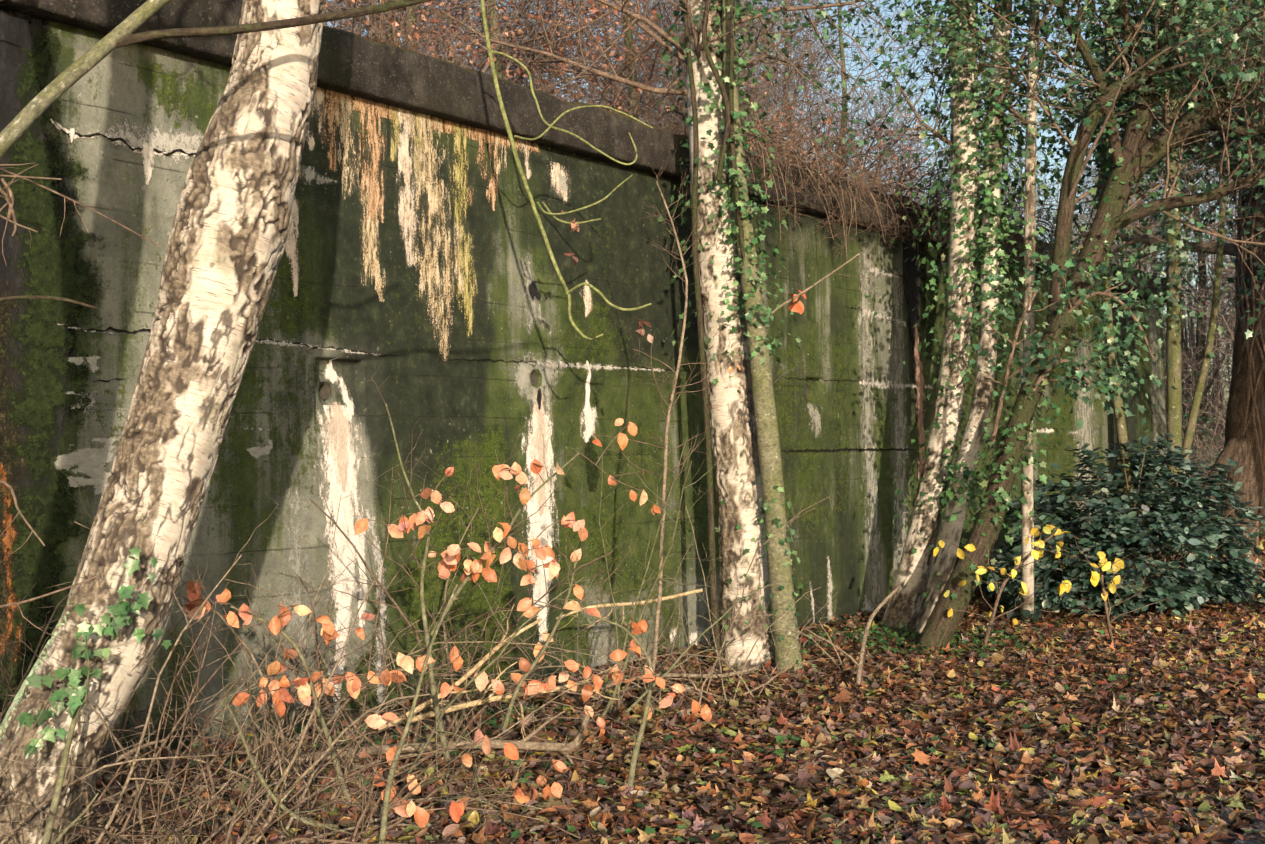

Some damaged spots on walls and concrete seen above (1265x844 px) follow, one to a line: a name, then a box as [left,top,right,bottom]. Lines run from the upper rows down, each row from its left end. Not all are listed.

crack [50,117,203,185]
water stain [285,199,299,297]
water stain [298,87,540,359]
spalling [65,391,95,414]
spalling [68,355,101,373]
water stain [514,353,561,410]
water stain [858,237,941,610]
spalling [54,437,116,495]
corrosion [0,463,22,662]